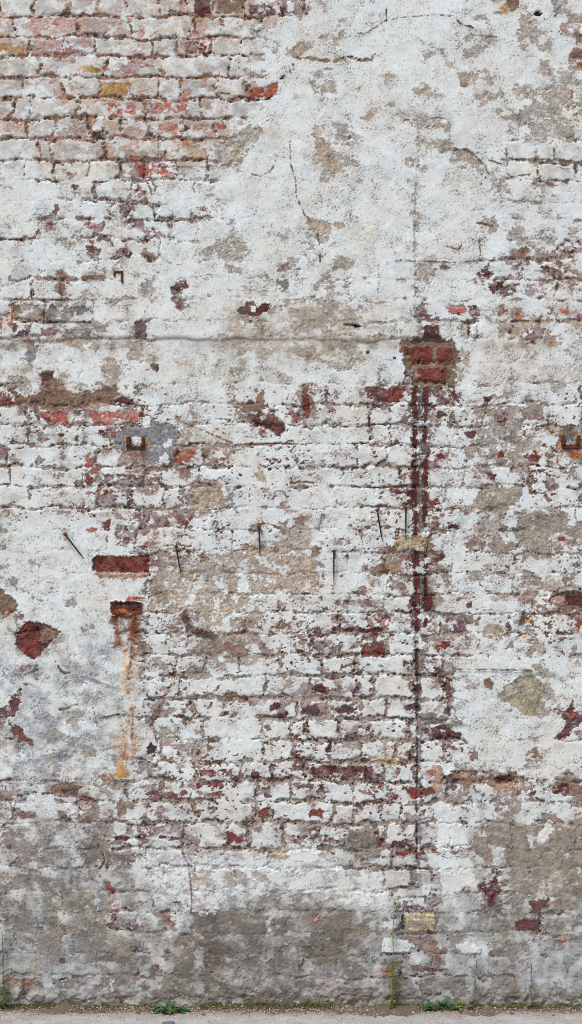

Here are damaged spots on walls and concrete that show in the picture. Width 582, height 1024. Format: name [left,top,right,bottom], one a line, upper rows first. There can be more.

flaking render [180,0,311,56]
flaking render [216,81,280,101]
crack [8,229,39,242]
crack [146,129,322,263]
crack [4,282,92,325]
rust [555,430,582,459]
peeling [84,438,322,672]
spalling [0,576,62,660]
rust [103,608,151,781]
flaking render [305,626,385,660]
spalling [416,601,473,742]
peeling [482,598,582,741]